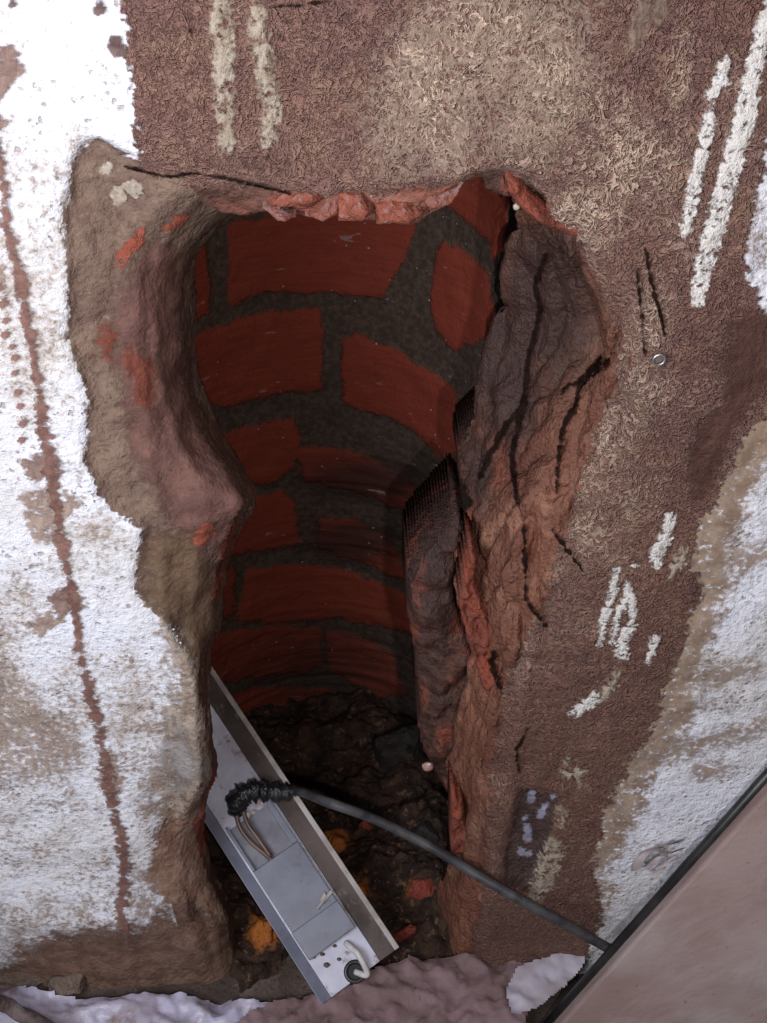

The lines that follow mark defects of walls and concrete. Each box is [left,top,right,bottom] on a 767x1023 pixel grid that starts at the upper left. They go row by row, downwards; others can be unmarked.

rust [0,44,24,100]
rust [93,1,105,16]
rust [107,35,128,58]
crack [123,165,291,195]
crack [636,247,666,357]
crack [477,254,548,628]
crack [555,355,610,494]
rust [0,151,135,949]
spalling [62,138,636,959]
leakage [588,310,767,929]
leakage [0,666,83,785]
leakage [567,671,620,718]